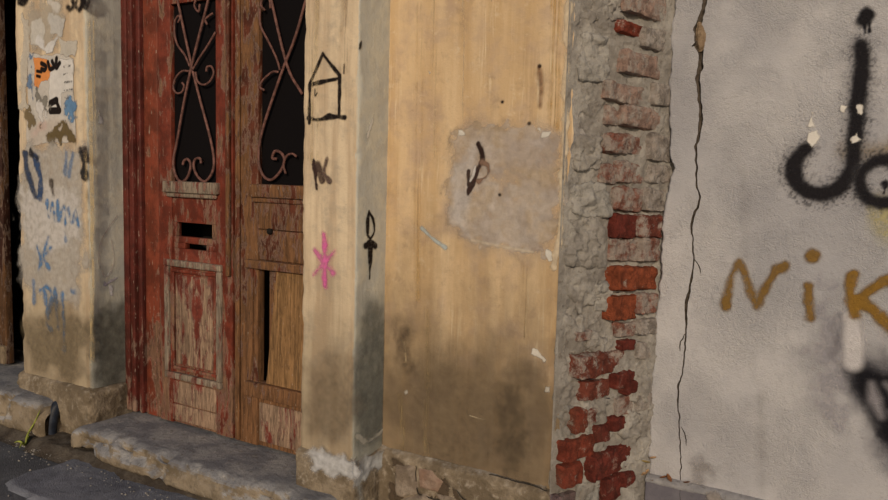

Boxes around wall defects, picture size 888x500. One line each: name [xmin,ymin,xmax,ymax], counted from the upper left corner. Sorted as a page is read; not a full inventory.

spalling [446,0,675,500]
crack [677,0,707,500]
peeling [807,112,820,146]